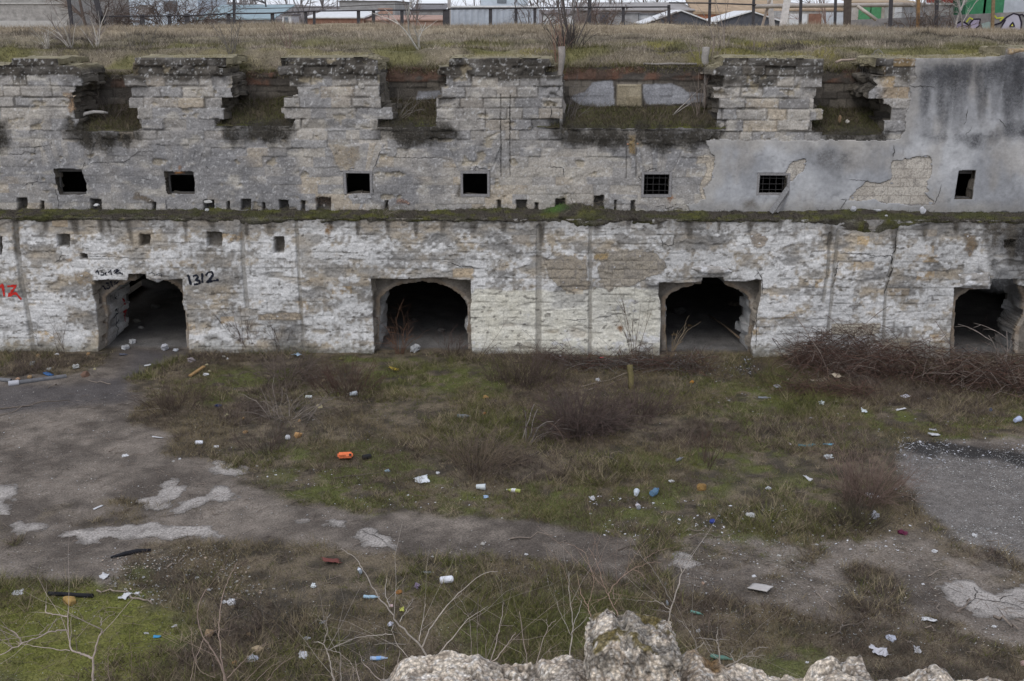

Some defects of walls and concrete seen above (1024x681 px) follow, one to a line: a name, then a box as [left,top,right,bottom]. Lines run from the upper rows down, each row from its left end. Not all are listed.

damp [924,54,1024,136]
peeling [849,155,934,205]
crack [832,229,898,294]